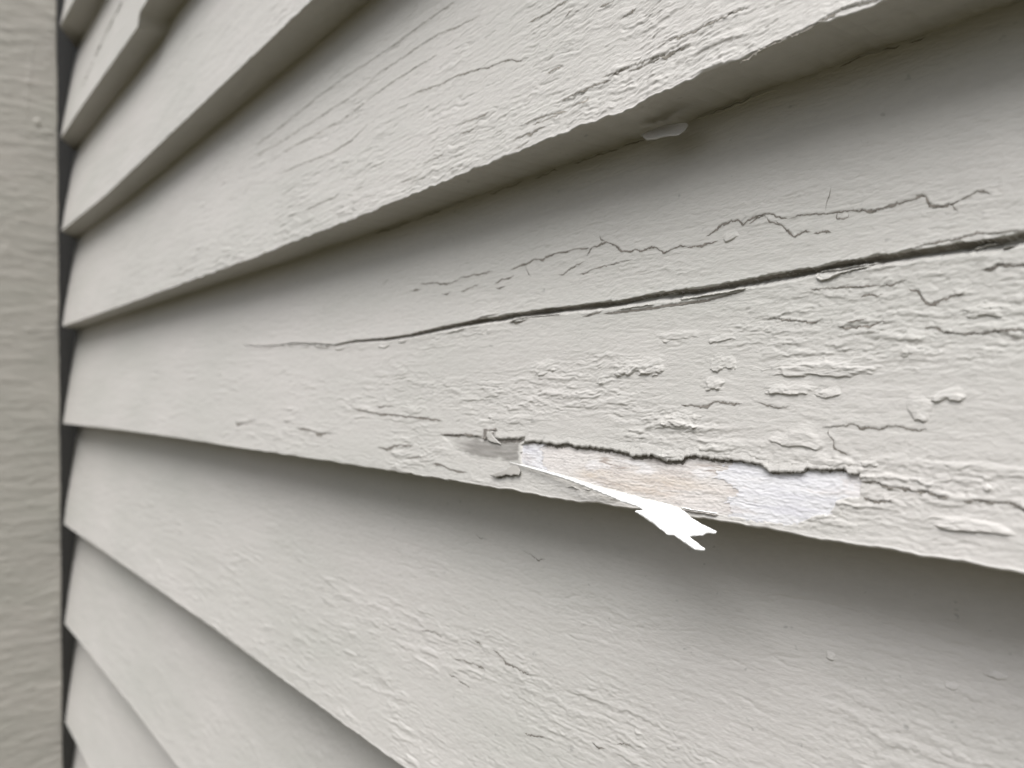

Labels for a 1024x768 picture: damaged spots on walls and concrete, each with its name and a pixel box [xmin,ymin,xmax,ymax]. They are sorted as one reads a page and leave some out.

crack [260,230,1024,351]
crack [375,190,990,295]
peeling [445,428,861,551]